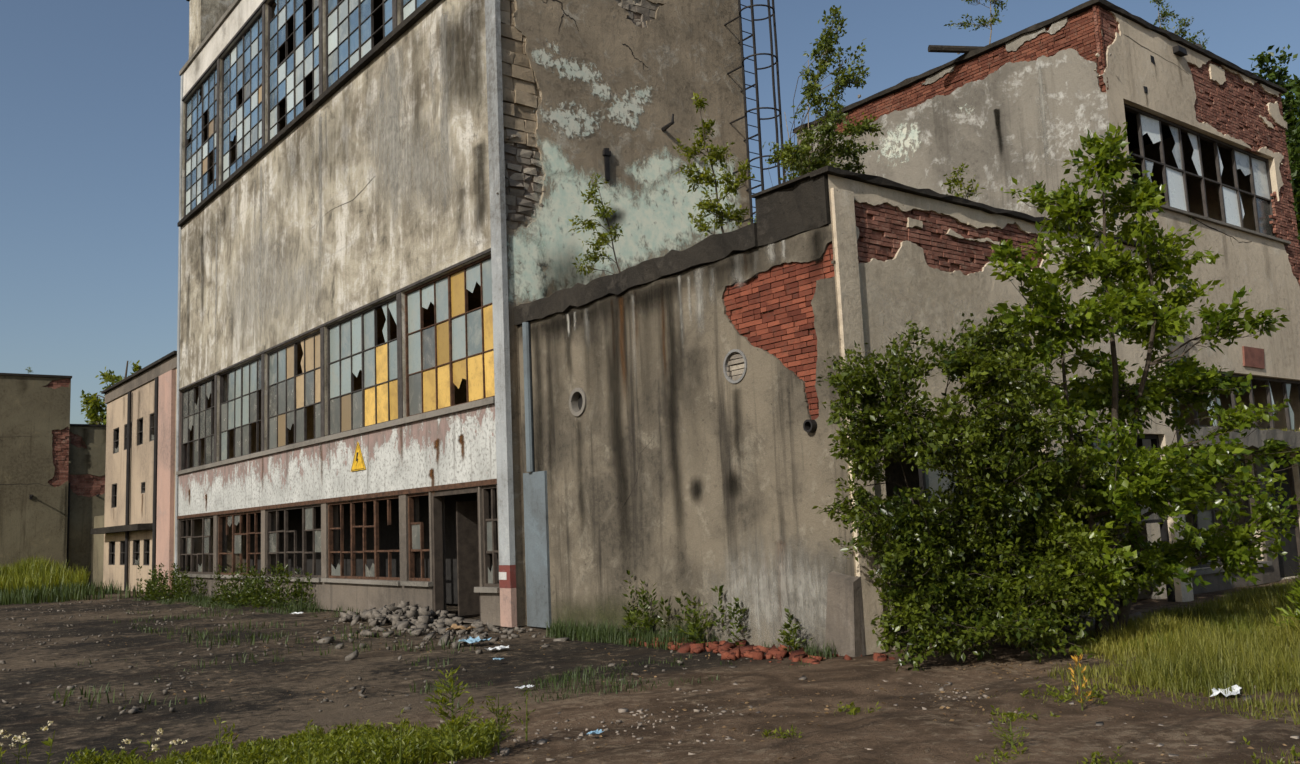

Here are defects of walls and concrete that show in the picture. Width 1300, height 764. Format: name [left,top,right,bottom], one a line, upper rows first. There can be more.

peeling [496,0,739,301]
spalling [854,202,1043,275]
spalling [835,5,1119,166]
spalling [1187,60,1300,286]
spalling [48,426,105,497]
water stain [530,240,785,517]
spalling [724,243,836,420]
water stain [726,564,826,627]